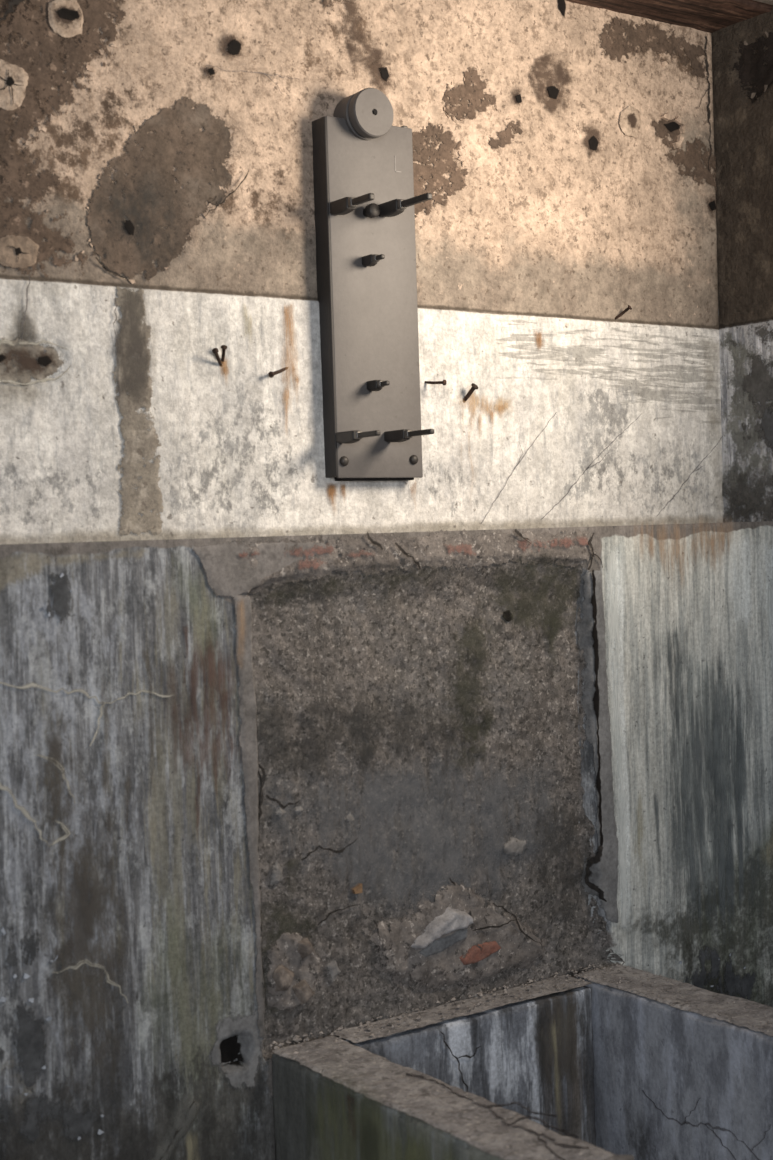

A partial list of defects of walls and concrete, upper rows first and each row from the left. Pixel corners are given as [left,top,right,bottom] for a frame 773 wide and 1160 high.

spalling [0,0,249,284]
spalling [0,338,70,386]
rust [284,306,299,415]
rust [469,393,508,423]
leakage [722,473,773,522]
spalling [235,529,596,594]
crack [585,532,607,902]
leakage [668,646,760,916]
leakage [44,739,124,1066]
spalling [361,874,548,992]
crack [406,1031,589,1160]
crack [643,1090,771,1160]